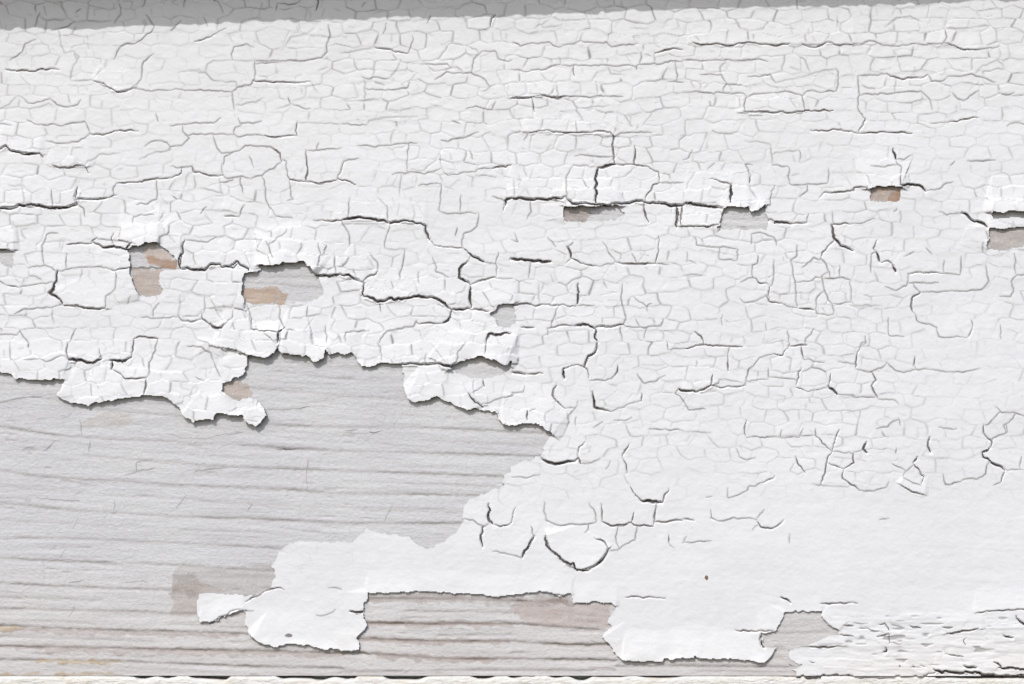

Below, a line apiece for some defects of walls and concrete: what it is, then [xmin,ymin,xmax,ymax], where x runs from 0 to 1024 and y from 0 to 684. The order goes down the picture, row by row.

peeling [127,242,181,297]
peeling [241,261,324,304]
crack [0,3,1024,495]
peeling [563,204,625,222]
peeling [717,204,774,230]
peeling [871,186,903,202]
peeling [986,210,1024,249]
peeling [0,328,839,676]
crack [464,443,790,572]